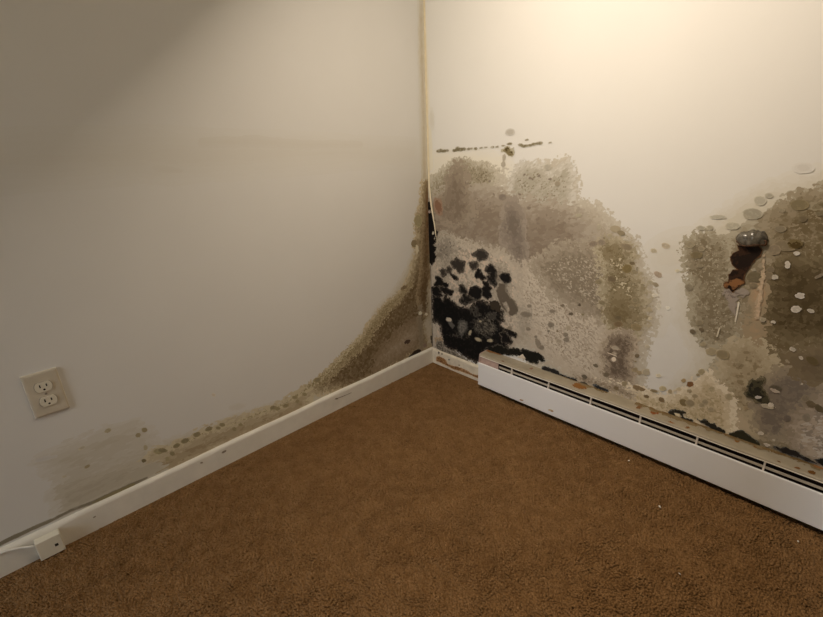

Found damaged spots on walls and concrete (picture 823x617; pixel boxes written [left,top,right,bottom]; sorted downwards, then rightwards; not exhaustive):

mould [602,243,623,261]
mould [431,267,459,288]
mould [449,257,466,274]
mould [458,283,477,306]
damp [468,247,530,319]
corrosion [723,245,762,293]
damp [601,287,641,330]
mould [470,311,498,339]
mould [668,409,693,422]
mould [699,419,725,433]